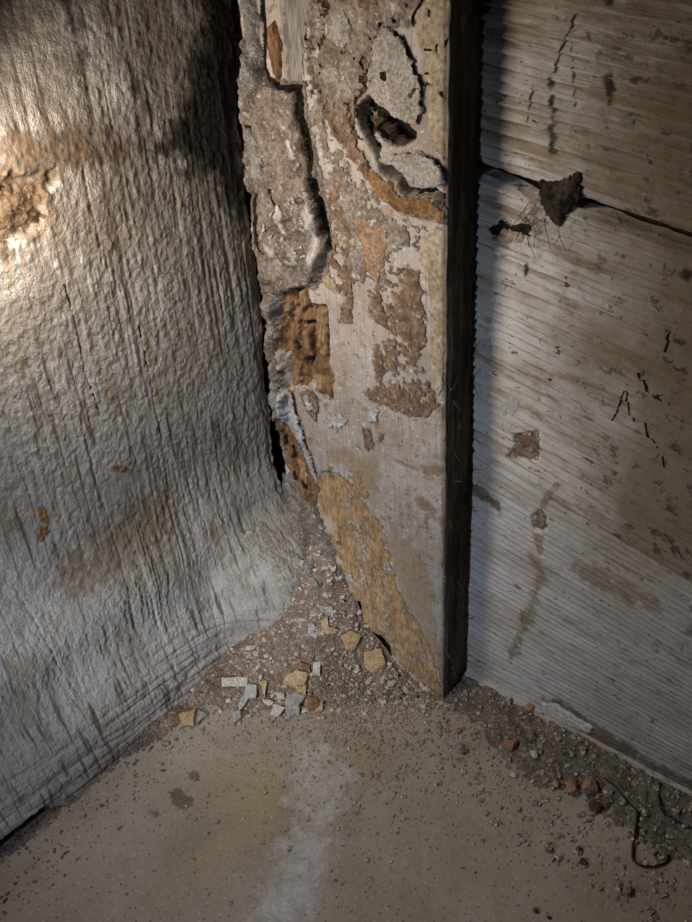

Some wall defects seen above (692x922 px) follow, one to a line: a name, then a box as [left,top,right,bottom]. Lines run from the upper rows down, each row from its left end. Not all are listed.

water stain [0,125,124,225]
crack [235,0,333,255]
peeling [283,0,449,189]
peeling [488,220,532,244]
peeling [260,288,302,344]
peeling [316,181,446,451]
peeling [268,360,348,489]
peeling [500,396,541,461]
peeling [190,550,444,724]